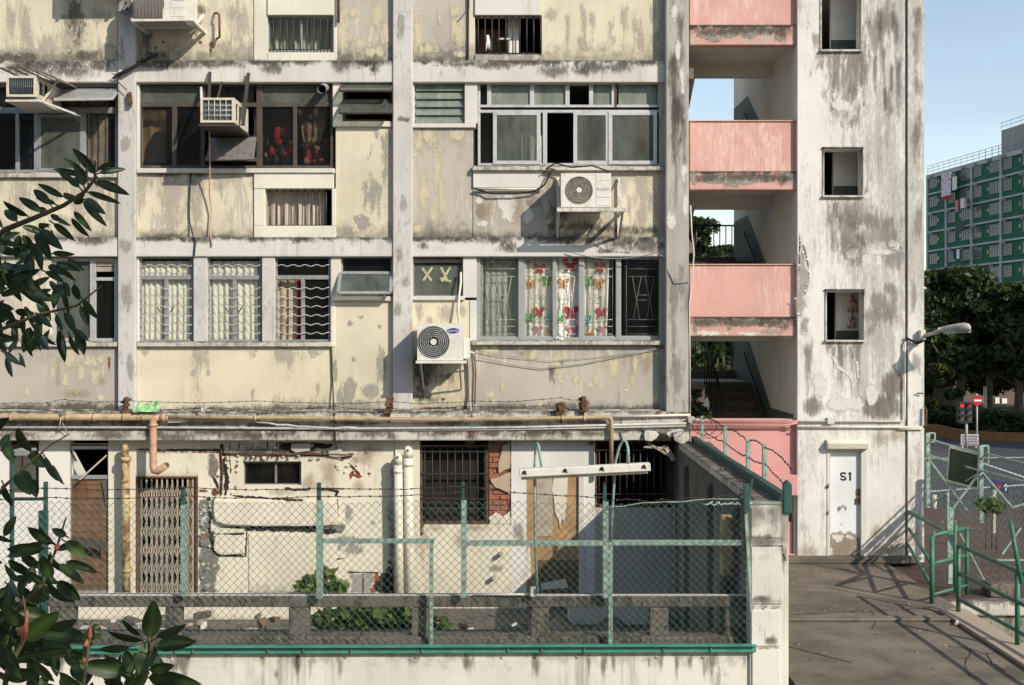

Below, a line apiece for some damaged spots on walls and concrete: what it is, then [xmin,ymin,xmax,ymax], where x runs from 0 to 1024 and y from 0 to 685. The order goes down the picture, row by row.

damp [697,26,786,36]
damp [451,59,655,77]
damp [813,0,901,127]
peeling [338,131,391,234]
peeling [474,175,556,228]
damp [696,173,792,185]
damp [829,189,904,268]
damp [915,211,923,235]
damp [690,319,792,330]
peeling [53,347,105,401]
spalling [488,441,511,524]